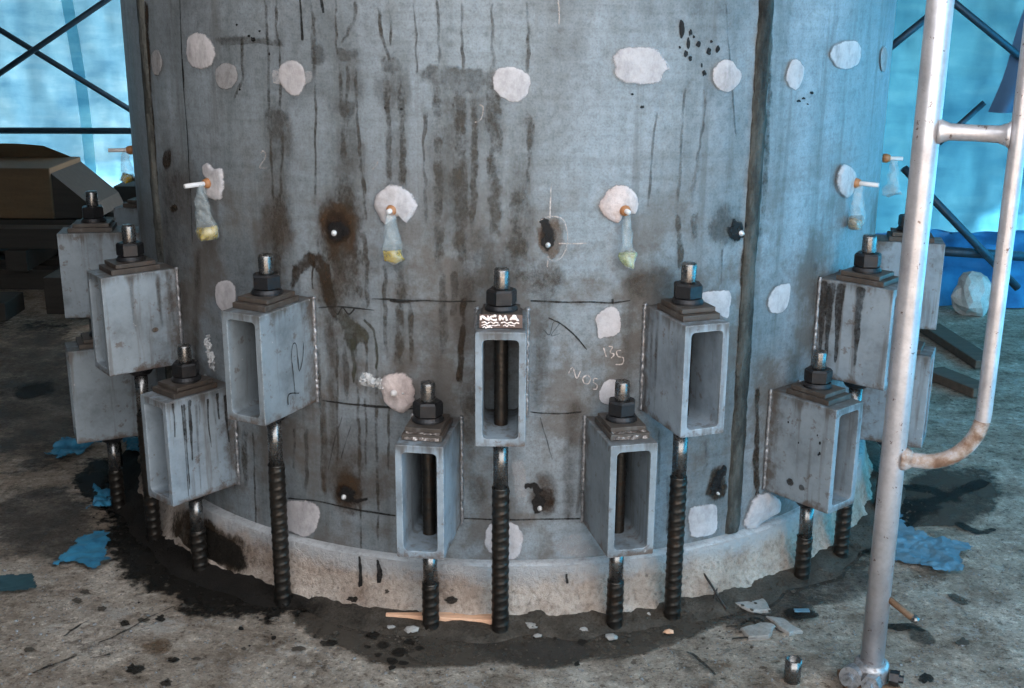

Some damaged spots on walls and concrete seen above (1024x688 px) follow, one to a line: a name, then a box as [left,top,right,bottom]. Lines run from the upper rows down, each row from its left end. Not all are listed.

water stain [378,14,392,60]
water stain [385,83,406,183]
water stain [422,86,502,259]
corrosion [292,203,359,331]
corrosion [323,451,361,514]
corrosion [532,476,555,514]